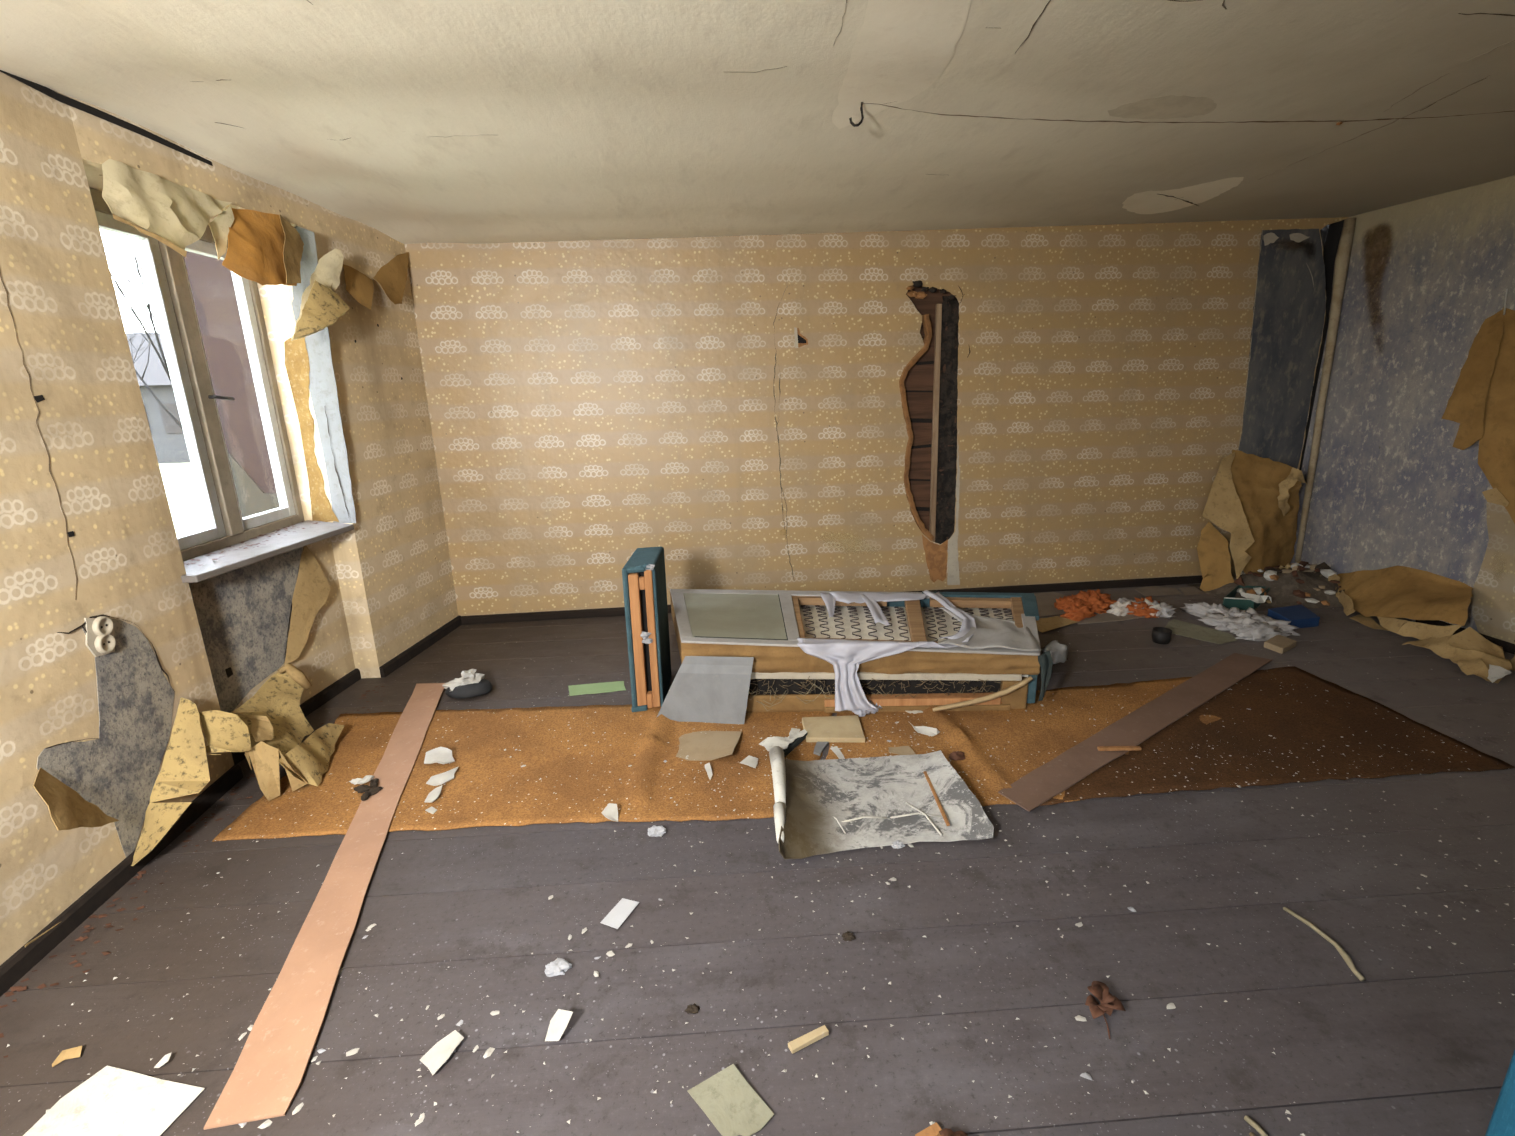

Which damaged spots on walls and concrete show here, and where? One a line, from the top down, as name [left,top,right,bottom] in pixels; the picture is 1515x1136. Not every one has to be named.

crack [986,0,1051,53]
crack [863,78,1513,123]
crack [1458,10,1515,18]
flaking render [1122,177,1244,214]
crack [0,272,77,600]
spalling [899,280,960,585]
peeling [189,545,331,713]
peeling [33,618,210,866]